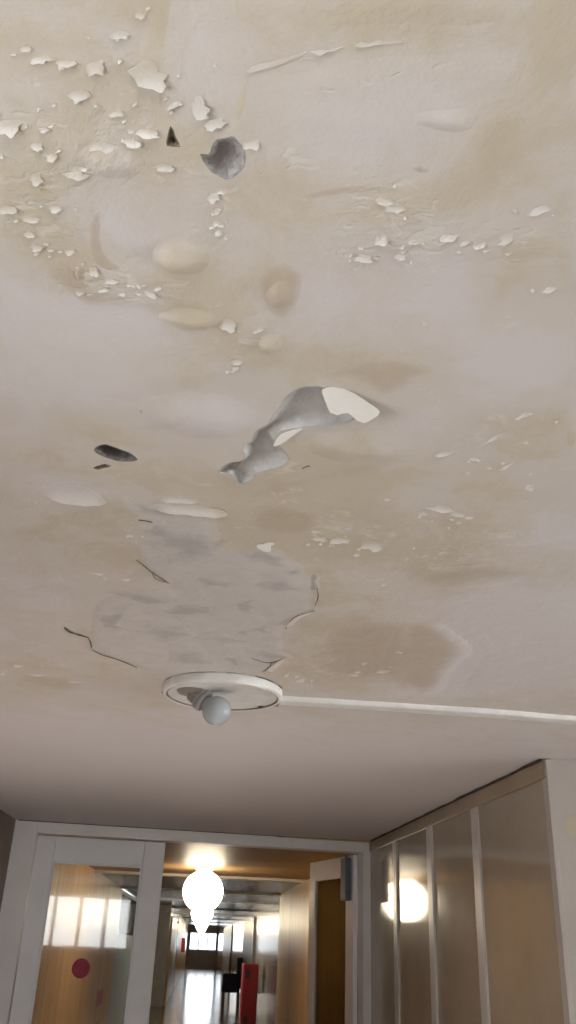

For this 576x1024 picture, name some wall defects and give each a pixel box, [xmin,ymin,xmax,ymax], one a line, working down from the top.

peeling [9,45,104,77]
peeling [247,39,407,73]
peeling [37,89,97,112]
spalling [89,59,267,240]
peeling [61,166,90,181]
peeling [375,184,408,220]
peeling [348,233,425,264]
peeling [440,230,517,256]
spalling [203,375,380,489]
spalling [81,437,151,472]
crack [64,627,137,668]
damp [285,607,473,696]